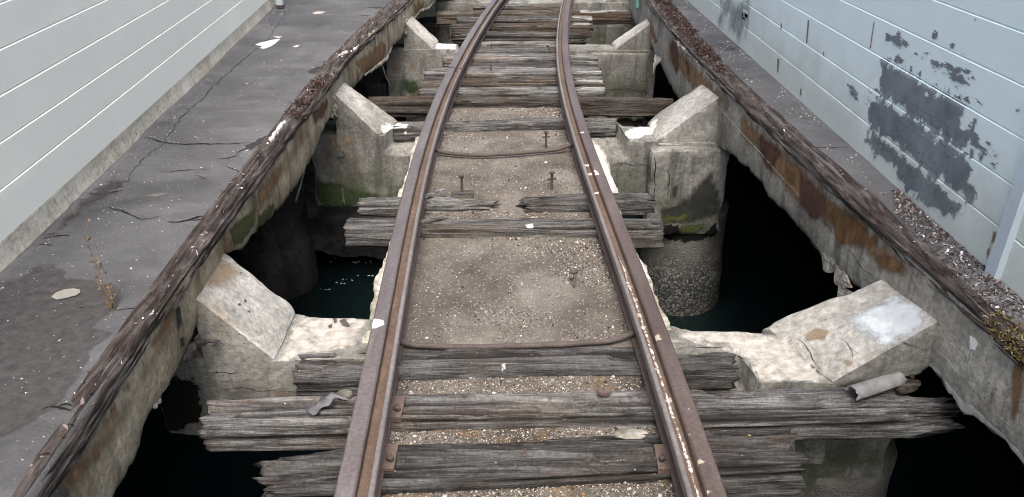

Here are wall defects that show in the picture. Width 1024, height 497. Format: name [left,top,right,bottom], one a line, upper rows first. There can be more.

crack [94,11,289,222]
damp [661,174,719,243]
corrosion [645,0,1024,418]
spalling [821,252,853,297]
peeling [847,30,998,219]